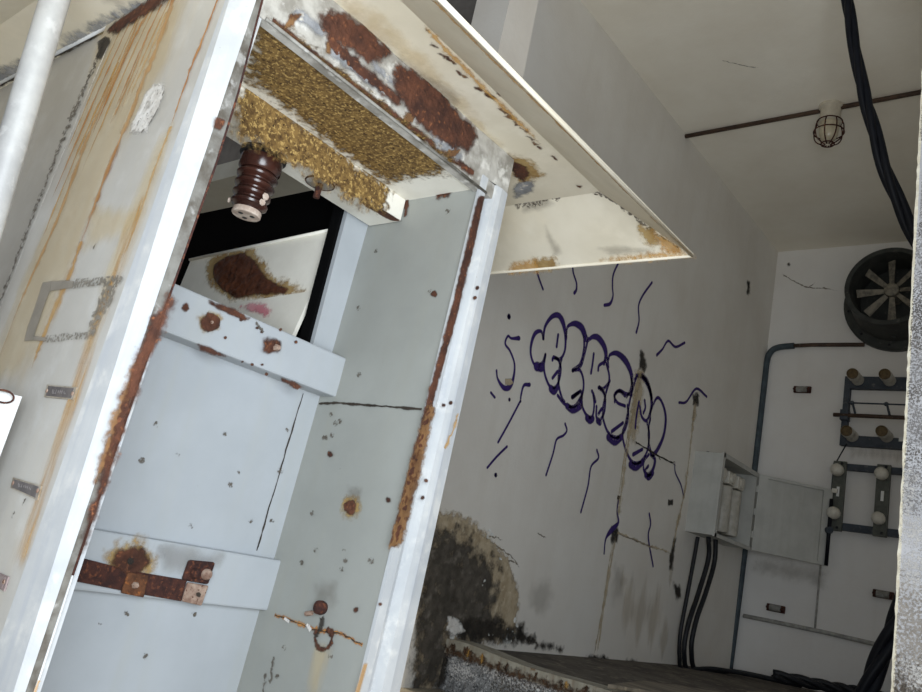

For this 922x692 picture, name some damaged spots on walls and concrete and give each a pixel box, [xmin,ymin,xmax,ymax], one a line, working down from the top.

water stain [517,623,563,652]